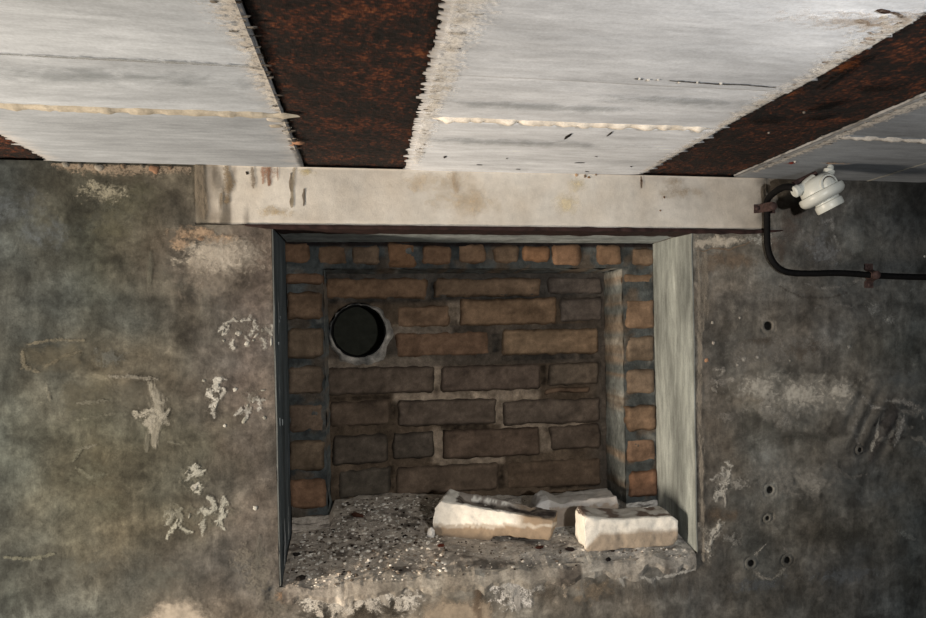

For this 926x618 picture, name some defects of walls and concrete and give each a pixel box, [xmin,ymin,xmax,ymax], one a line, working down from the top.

damp [218,302,281,350]
damp [110,374,169,452]
damp [202,377,238,427]
damp [234,389,266,423]
damp [706,369,851,426]
damp [163,463,227,539]